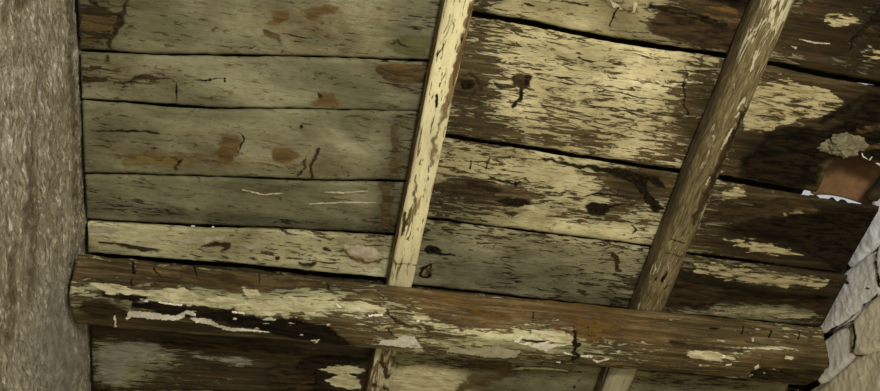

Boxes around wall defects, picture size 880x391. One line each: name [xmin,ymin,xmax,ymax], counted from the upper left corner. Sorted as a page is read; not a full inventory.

peeling [712,78,843,149]
damp [692,92,880,272]
peeling [693,262,830,289]
peeling [90,283,317,333]
peeling [336,301,386,317]
peeling [710,306,814,319]
peeling [378,329,621,372]
peeling [687,340,740,366]
peeling [748,338,799,360]